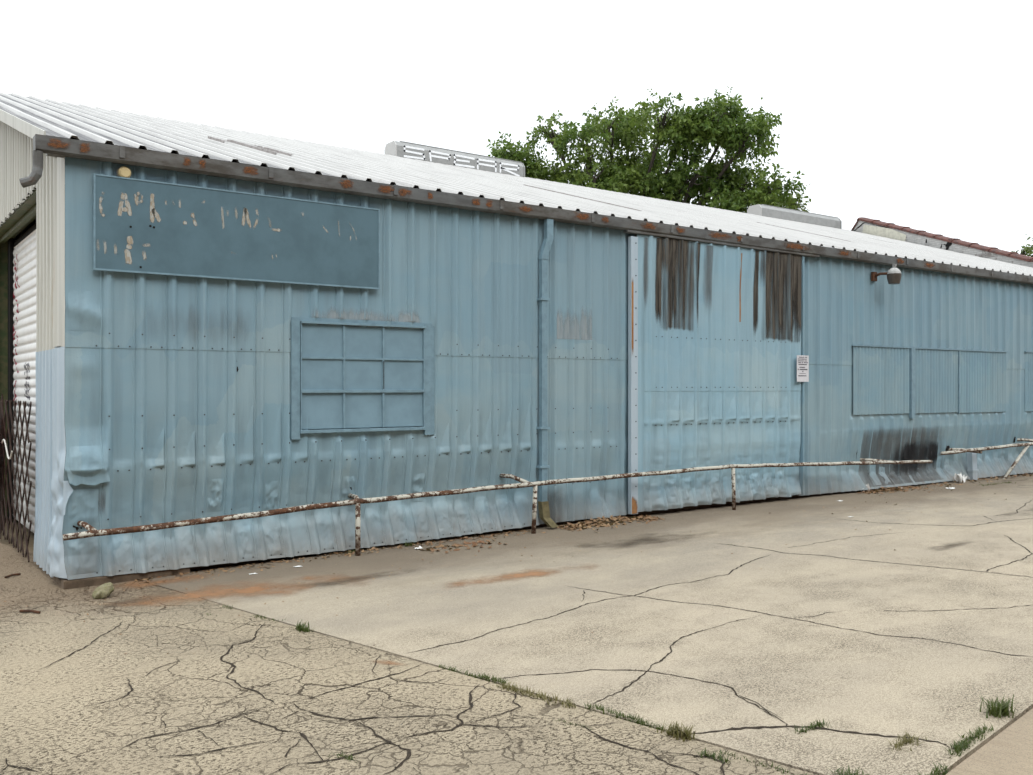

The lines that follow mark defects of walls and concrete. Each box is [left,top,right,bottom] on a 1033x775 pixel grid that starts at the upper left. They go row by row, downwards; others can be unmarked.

corrosion [48,139,89,152]
corrosion [379,186,411,196]
damp [644,237,712,330]
damp [753,250,802,342]
damp [928,444,938,460]
crack [43,621,123,668]
crack [111,502,1033,775]
crack [80,660,179,708]
crack [2,758,38,772]